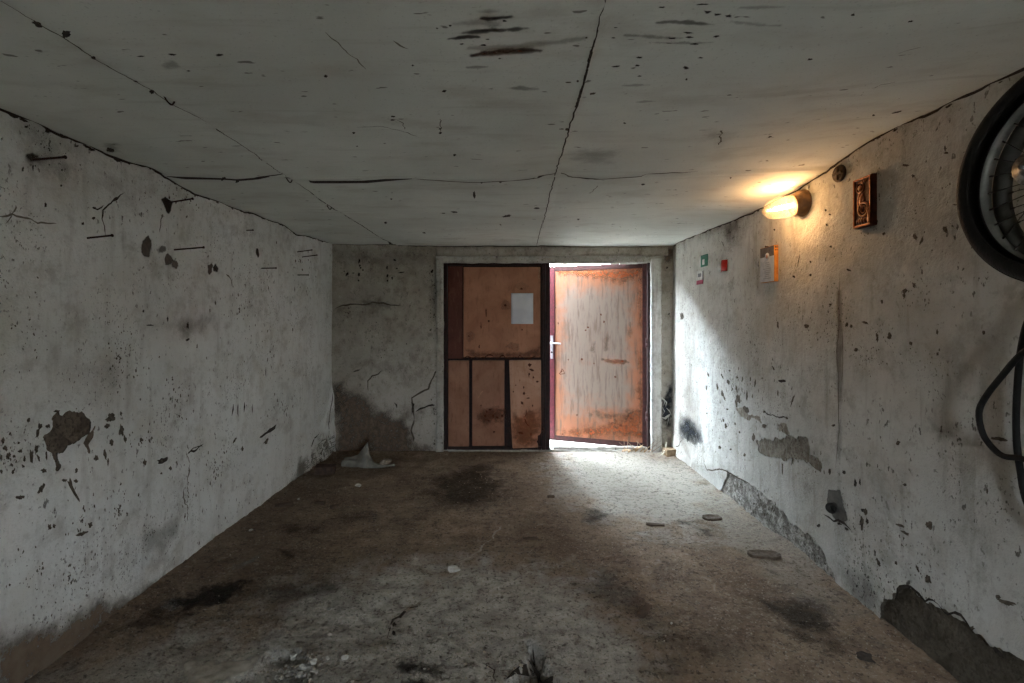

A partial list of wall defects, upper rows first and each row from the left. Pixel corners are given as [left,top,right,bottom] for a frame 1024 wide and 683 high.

crack [0,0,697,247]
spalling [0,408,185,536]
leakage [294,383,430,480]
crack [395,371,436,442]
corrosion [464,345,540,446]
corrosion [558,268,642,438]
spalling [706,367,831,475]
spalling [703,458,835,579]
peeling [888,519,932,547]
spalling [883,565,1024,683]